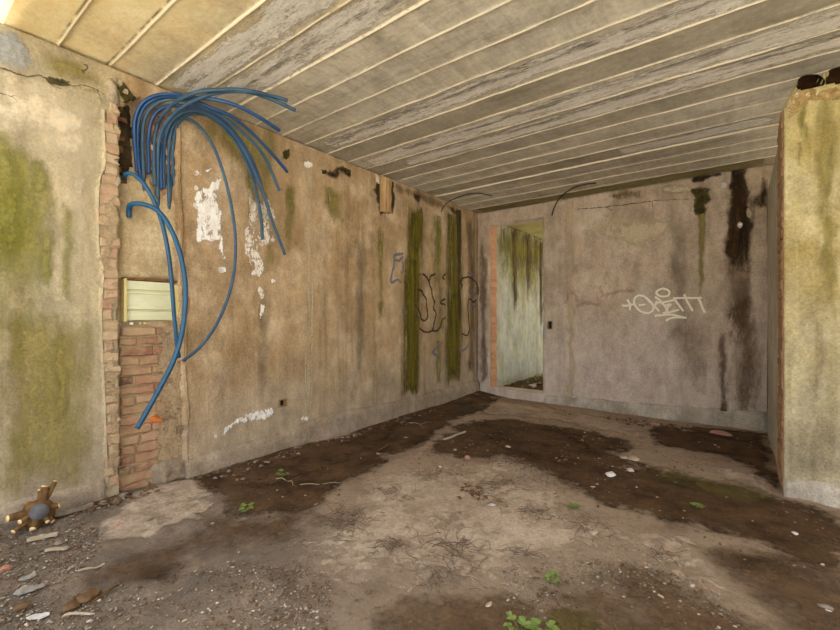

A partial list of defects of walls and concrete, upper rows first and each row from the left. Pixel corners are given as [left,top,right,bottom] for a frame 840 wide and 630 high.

water stain [0,90,87,155]
crack [0,67,105,102]
flaking render [95,80,193,492]
peeling [149,108,226,273]
peeling [245,189,275,319]
water stain [397,186,487,392]
water stain [503,229,543,325]
water stain [725,169,768,408]
peeling [214,408,273,438]